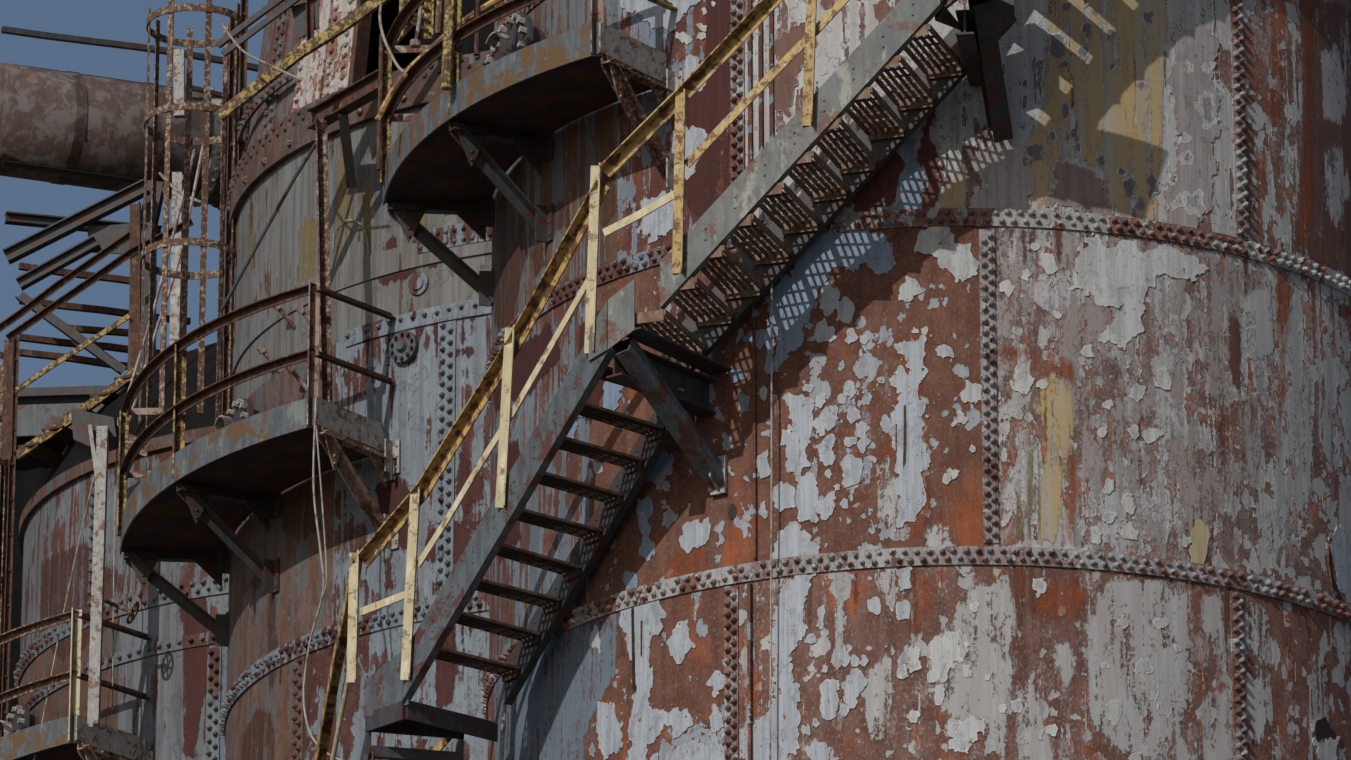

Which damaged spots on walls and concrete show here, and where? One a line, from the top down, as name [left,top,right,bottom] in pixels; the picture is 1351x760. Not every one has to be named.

peeling [969,23,1221,228]
peeling [914,226,979,283]
rust [415,316,475,358]
rust [493,310,600,413]
peeling [727,230,956,559]
peeling [996,226,1334,564]
rust [381,520,409,591]
rust [454,439,520,564]
peeling [679,517,712,554]
rust [179,597,209,759]
rust [434,613,474,708]
peeling [494,566,1274,760]